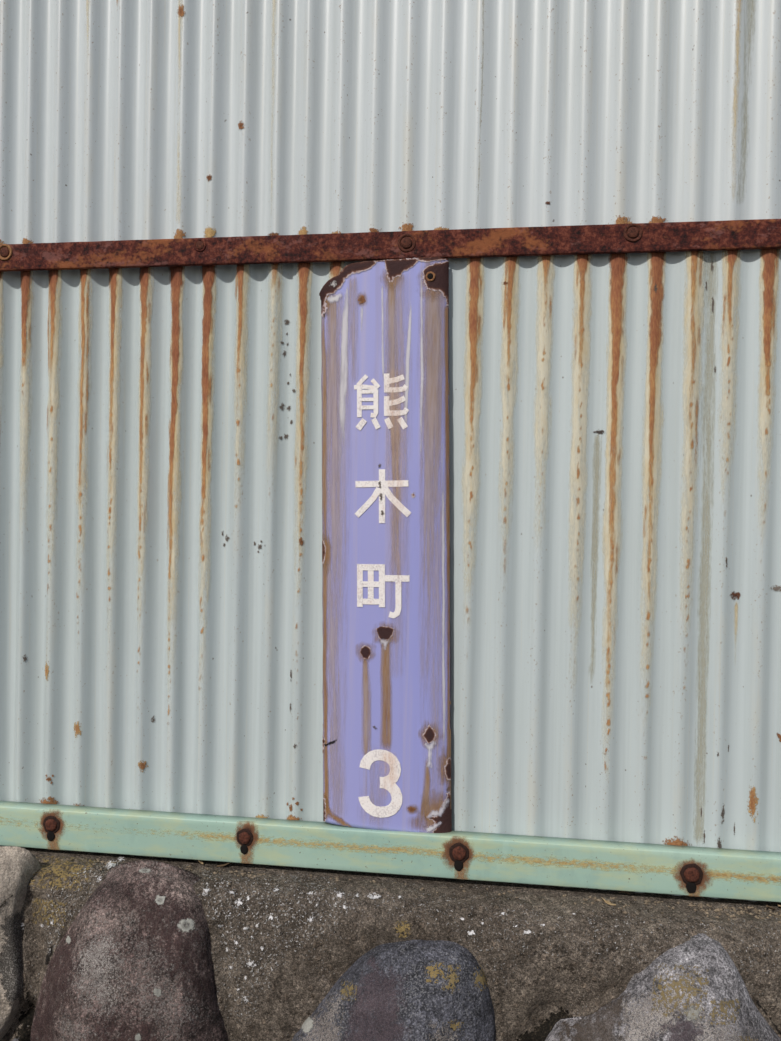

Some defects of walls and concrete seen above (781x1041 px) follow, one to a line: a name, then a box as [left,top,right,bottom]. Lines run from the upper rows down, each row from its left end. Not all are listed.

corrosion [0,215,781,706]
corrosion [36,796,64,850]
corrosion [169,815,781,897]
corrosion [748,787,759,822]